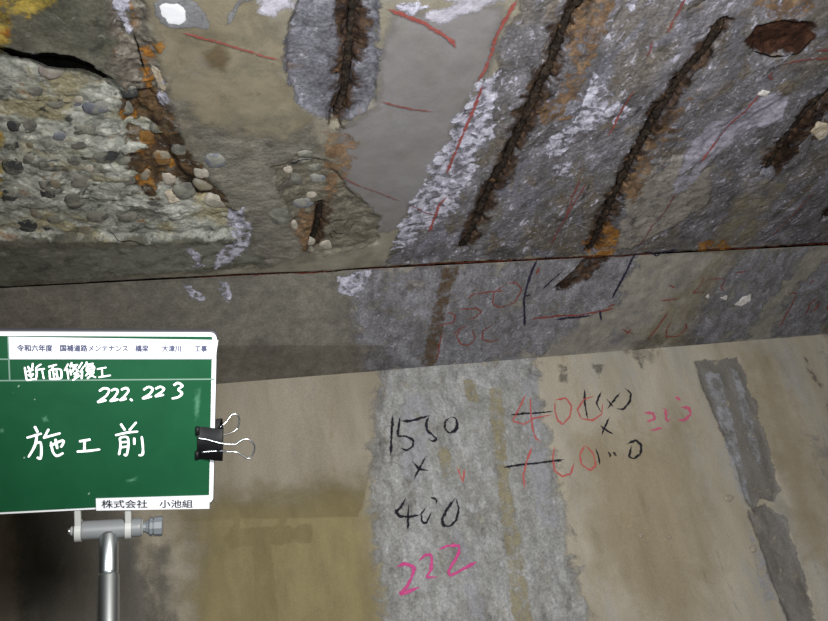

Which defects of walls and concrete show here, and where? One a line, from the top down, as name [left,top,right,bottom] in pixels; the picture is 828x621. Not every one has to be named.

corrosion [0,0,55,45]
crack [0,46,116,81]
spalling [0,0,246,245]
corrosion [119,42,228,208]
corrosion [197,270,337,278]
spalling [269,150,382,257]
spalling [281,0,384,121]
corrosion [293,0,374,251]
corrosion [415,0,735,366]
peeling [386,0,828,265]
corrosion [697,240,828,251]
corrosion [760,89,828,175]